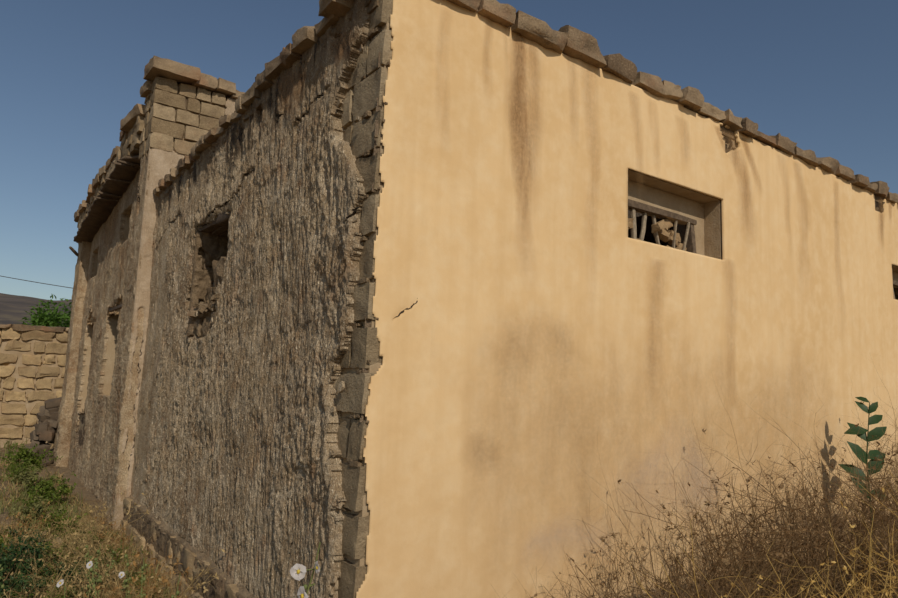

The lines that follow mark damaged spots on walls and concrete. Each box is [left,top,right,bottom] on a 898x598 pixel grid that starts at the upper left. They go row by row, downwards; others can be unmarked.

crack [171,145,260,227]
spalling [328,0,393,598]
spalling [72,409,85,453]